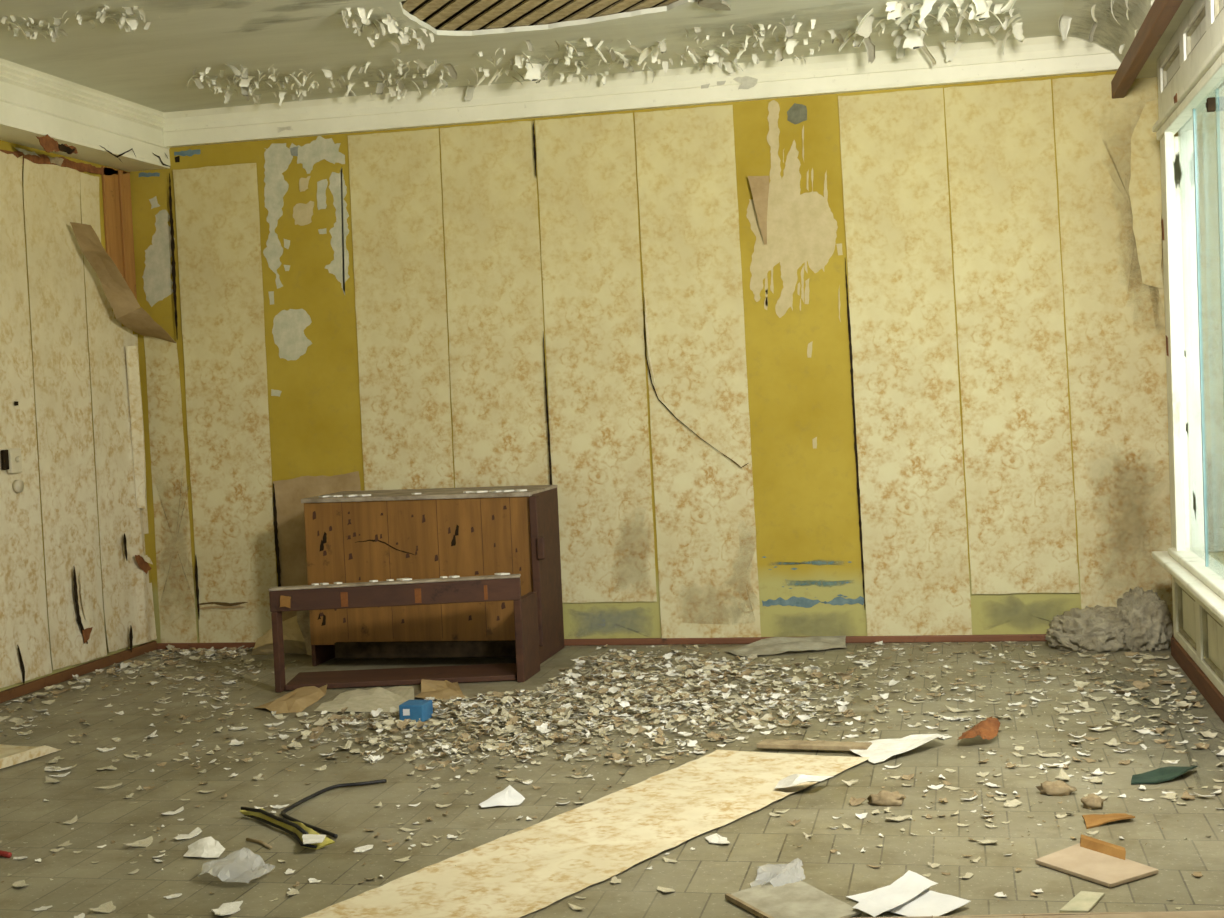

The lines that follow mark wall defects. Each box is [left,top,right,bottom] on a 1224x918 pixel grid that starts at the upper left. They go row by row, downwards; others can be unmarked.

peeling [1,4,161,43]
flaking render [187,0,1025,106]
peeling [1058,15,1072,41]
peeling [1089,0,1138,54]
flaking render [36,134,78,154]
peeling [174,149,201,162]
peeling [746,100,843,318]
peeling [142,196,175,307]
peeling [263,136,350,361]